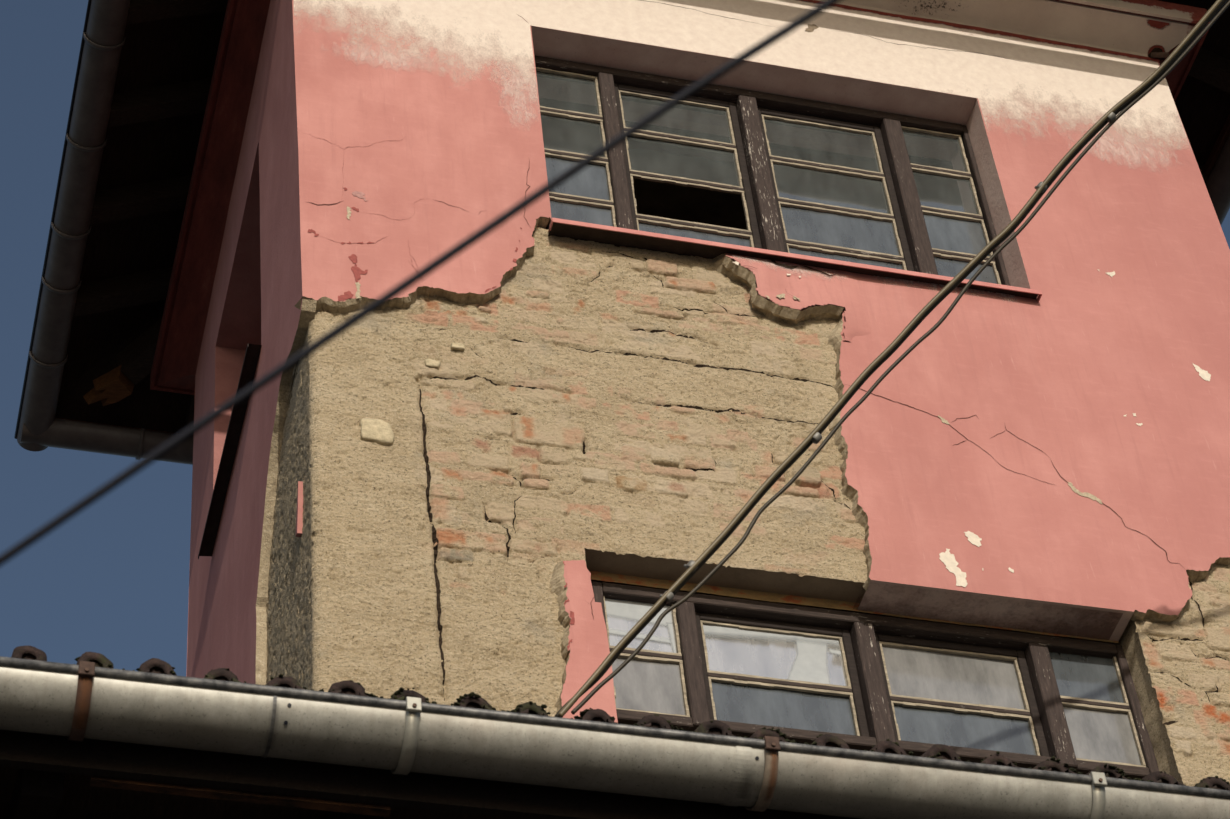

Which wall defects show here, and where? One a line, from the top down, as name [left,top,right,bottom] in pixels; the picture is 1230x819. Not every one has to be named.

water stain [294,0,1187,161]
crack [309,137,401,205]
peeling [1193,364,1211,381]
crack [418,338,544,701]
crack [484,477,576,561]
spalling [256,217,872,717]
peeling [939,548,968,587]
peeling [964,531,982,547]
crack [1102,503,1226,702]
spalling [1114,557,1230,786]